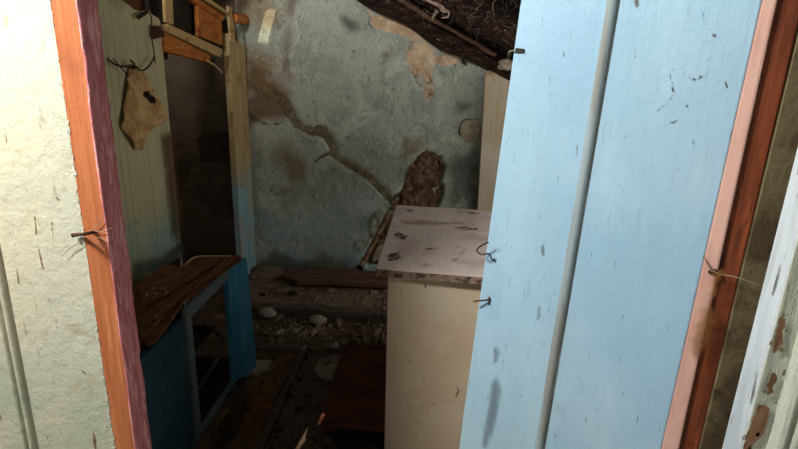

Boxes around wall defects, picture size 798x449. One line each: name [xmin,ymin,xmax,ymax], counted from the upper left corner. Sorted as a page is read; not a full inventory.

spalling [367,8,467,100]
crack [248,84,393,205]
spalling [365,150,446,265]
peeling [769,313,788,353]
peeling [742,370,786,449]